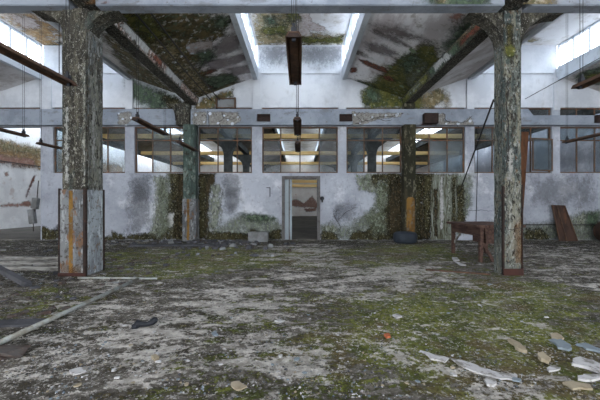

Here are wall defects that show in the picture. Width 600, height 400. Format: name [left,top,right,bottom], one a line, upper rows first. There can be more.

water stain [103,30,186,109]
water stain [122,13,250,109]
water stain [355,25,450,109]
peeling [193,112,241,125]